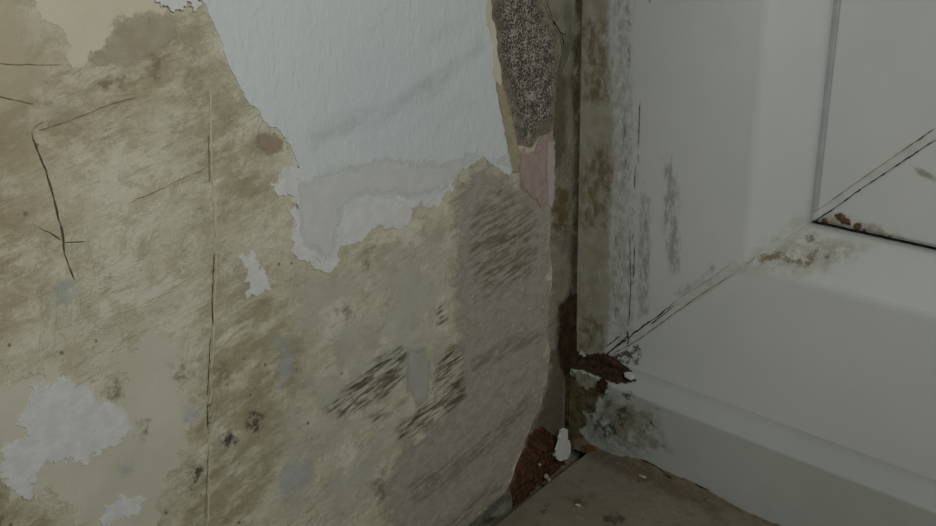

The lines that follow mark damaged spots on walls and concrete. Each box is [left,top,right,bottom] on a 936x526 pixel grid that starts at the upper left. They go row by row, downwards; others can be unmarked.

crack [32,122,85,280]
peeling [0,0,571,526]
damp [529,0,733,450]
damp [746,252,814,265]
damp [812,128,936,250]
rust [560,325,636,395]